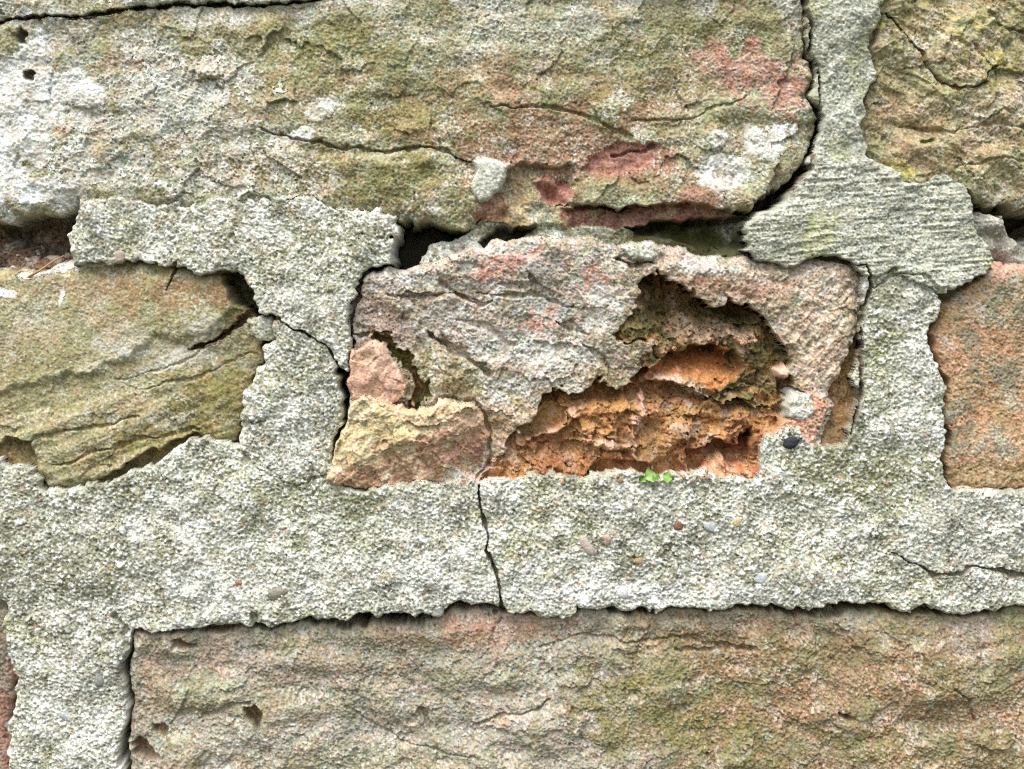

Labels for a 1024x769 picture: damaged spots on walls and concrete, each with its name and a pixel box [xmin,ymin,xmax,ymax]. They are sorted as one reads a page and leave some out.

spalling [480,241,816,483]
crack [478,484,505,607]
crack [891,552,1024,580]